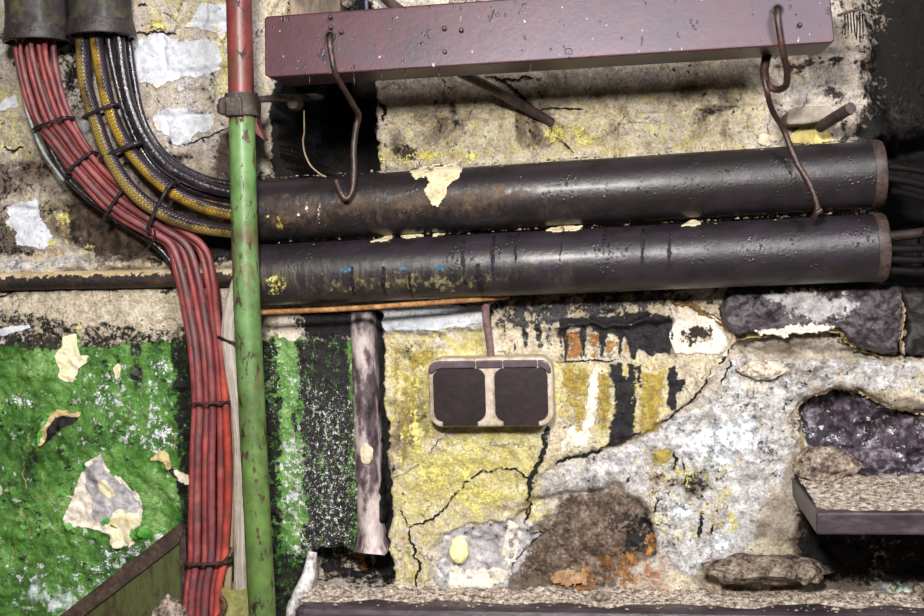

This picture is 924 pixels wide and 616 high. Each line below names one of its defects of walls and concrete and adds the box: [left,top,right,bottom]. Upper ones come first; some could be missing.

peeling [133,2,227,89]
peeling [153,107,216,145]
peeling [6,198,52,250]
leakage [0,308,111,353]
flaking render [669,279,924,379]
peeling [58,454,165,549]
leakage [82,343,178,435]
leakage [138,409,178,453]
spalling [438,483,657,590]
crack [395,349,732,587]
corrosion [581,532,657,587]
spalling [794,385,924,472]